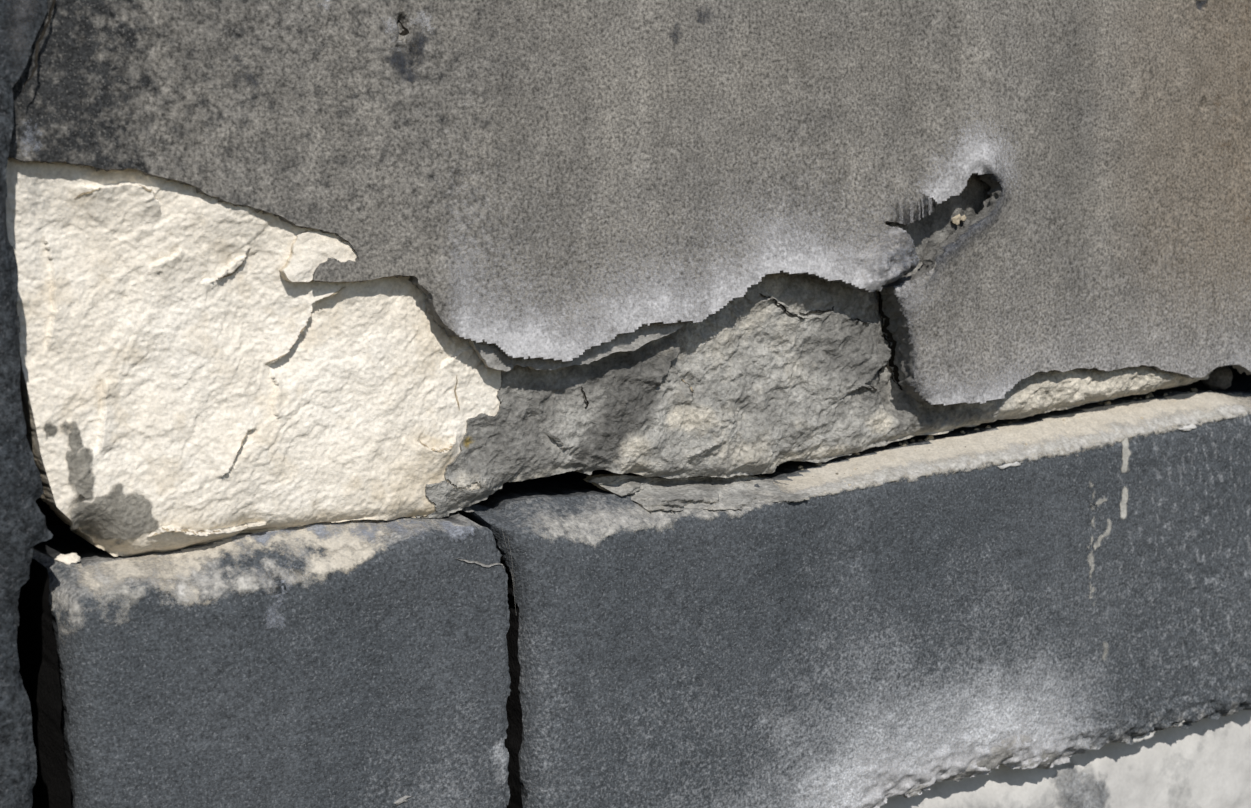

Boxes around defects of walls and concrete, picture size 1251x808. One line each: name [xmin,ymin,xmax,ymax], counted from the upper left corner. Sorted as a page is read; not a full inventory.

spalling [6,157,1213,557]
peeling [55,553,81,565]
damp [1088,437,1131,598]